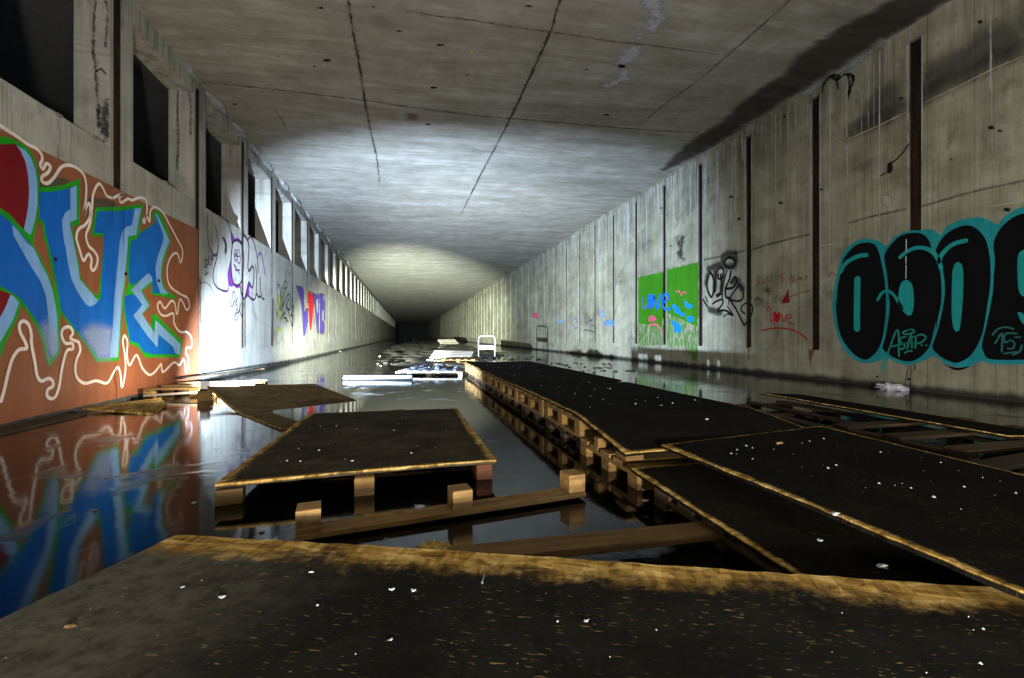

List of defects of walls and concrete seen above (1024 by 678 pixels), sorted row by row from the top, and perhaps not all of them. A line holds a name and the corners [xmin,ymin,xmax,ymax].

leakage [98,99,109,142]
crack [176,0,790,208]
leakage [527,0,959,294]